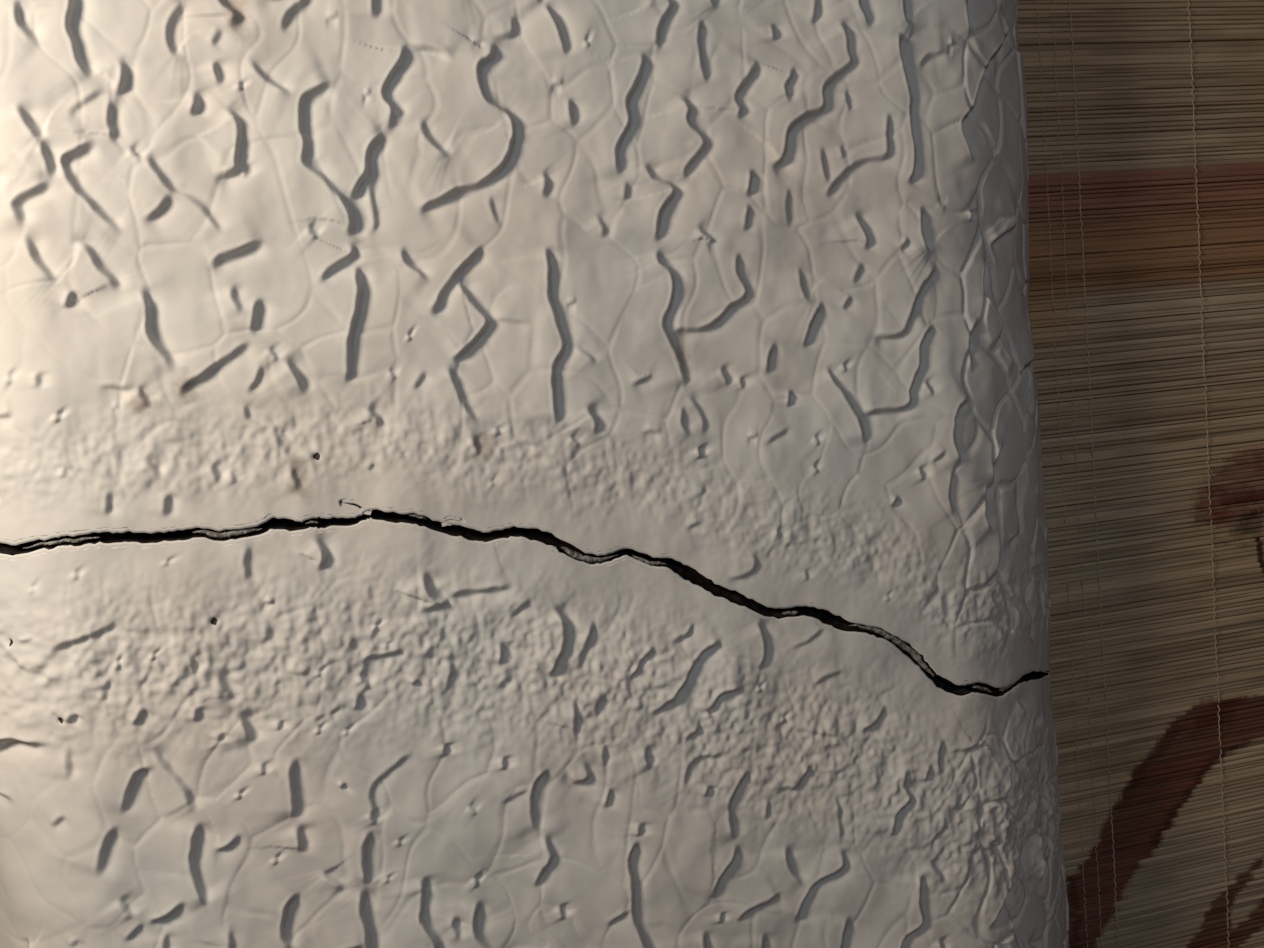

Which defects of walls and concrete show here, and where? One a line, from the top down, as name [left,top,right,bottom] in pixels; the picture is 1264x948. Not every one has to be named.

crack [0,499,1050,701]